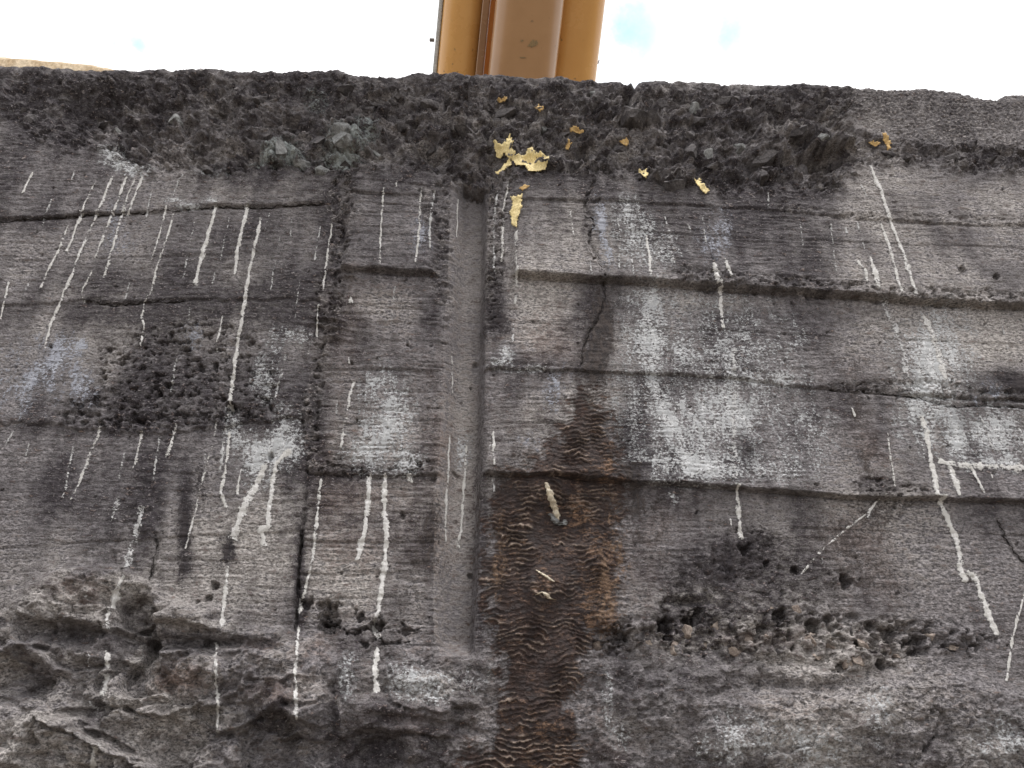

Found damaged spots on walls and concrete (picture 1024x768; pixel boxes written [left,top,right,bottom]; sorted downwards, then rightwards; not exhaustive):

leakage [0,144,156,418]
leakage [88,650,112,710]
leakage [102,505,145,629]
leakage [140,169,319,626]
crack [293,530,303,631]
leakage [293,479,323,720]
leakage [336,365,490,706]
spalling [0,66,1024,484]
corrosion [459,275,669,768]
spalling [596,521,999,676]
leakage [861,165,918,294]
leakage [830,222,1024,681]